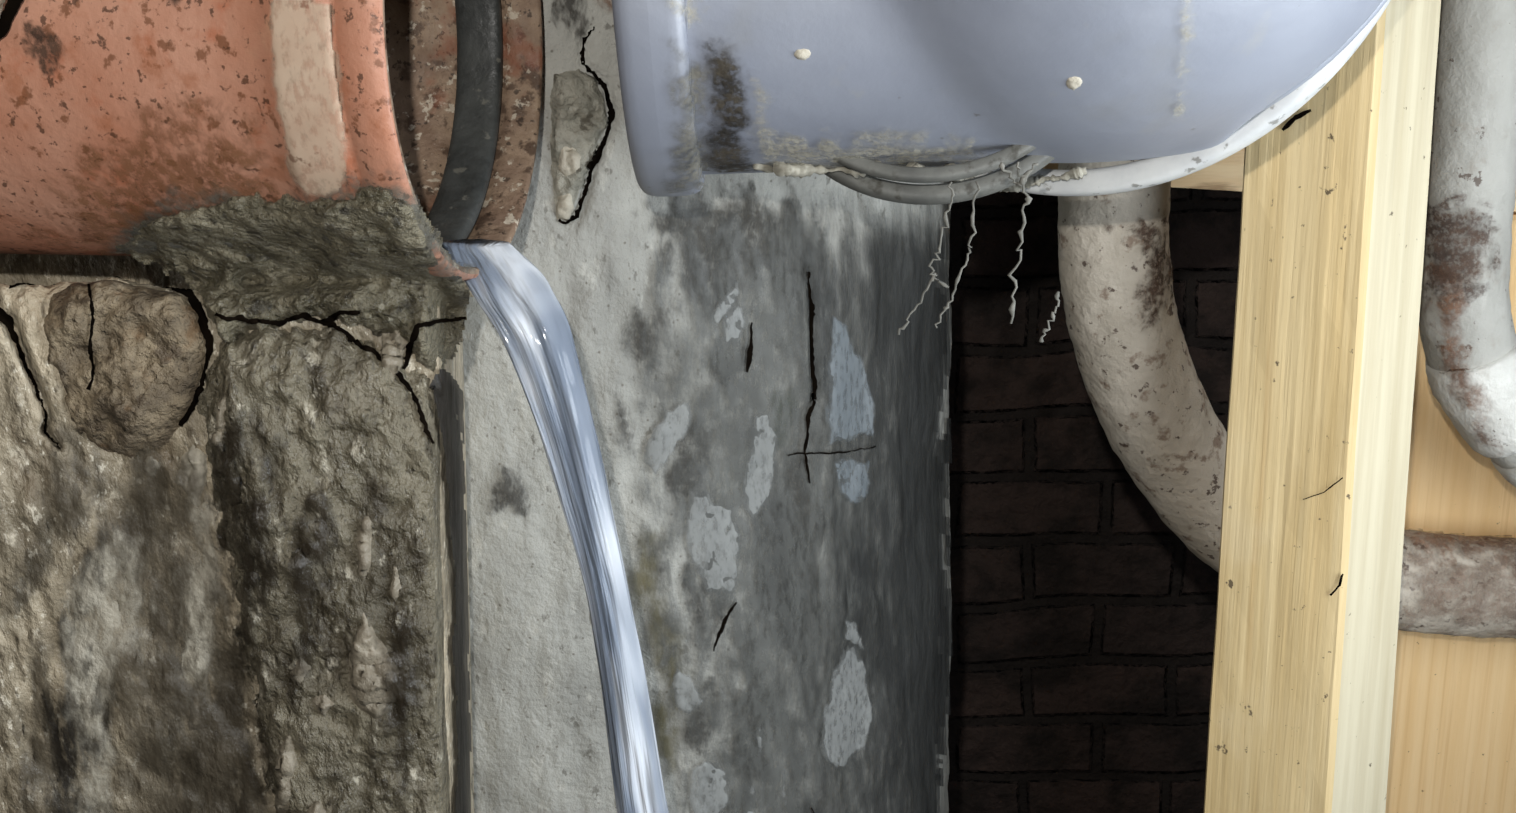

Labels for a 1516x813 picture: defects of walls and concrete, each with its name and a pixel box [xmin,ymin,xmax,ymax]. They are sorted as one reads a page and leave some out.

crack [0,0,23,39]
crack [558,27,615,224]
leakage [13,421,335,813]
crack [0,276,466,449]
leakage [384,623,420,789]
leakage [429,369,472,813]
leakage [618,401,628,437]
crack [713,602,737,651]
leakage [625,182,953,813]
crack [788,272,876,483]